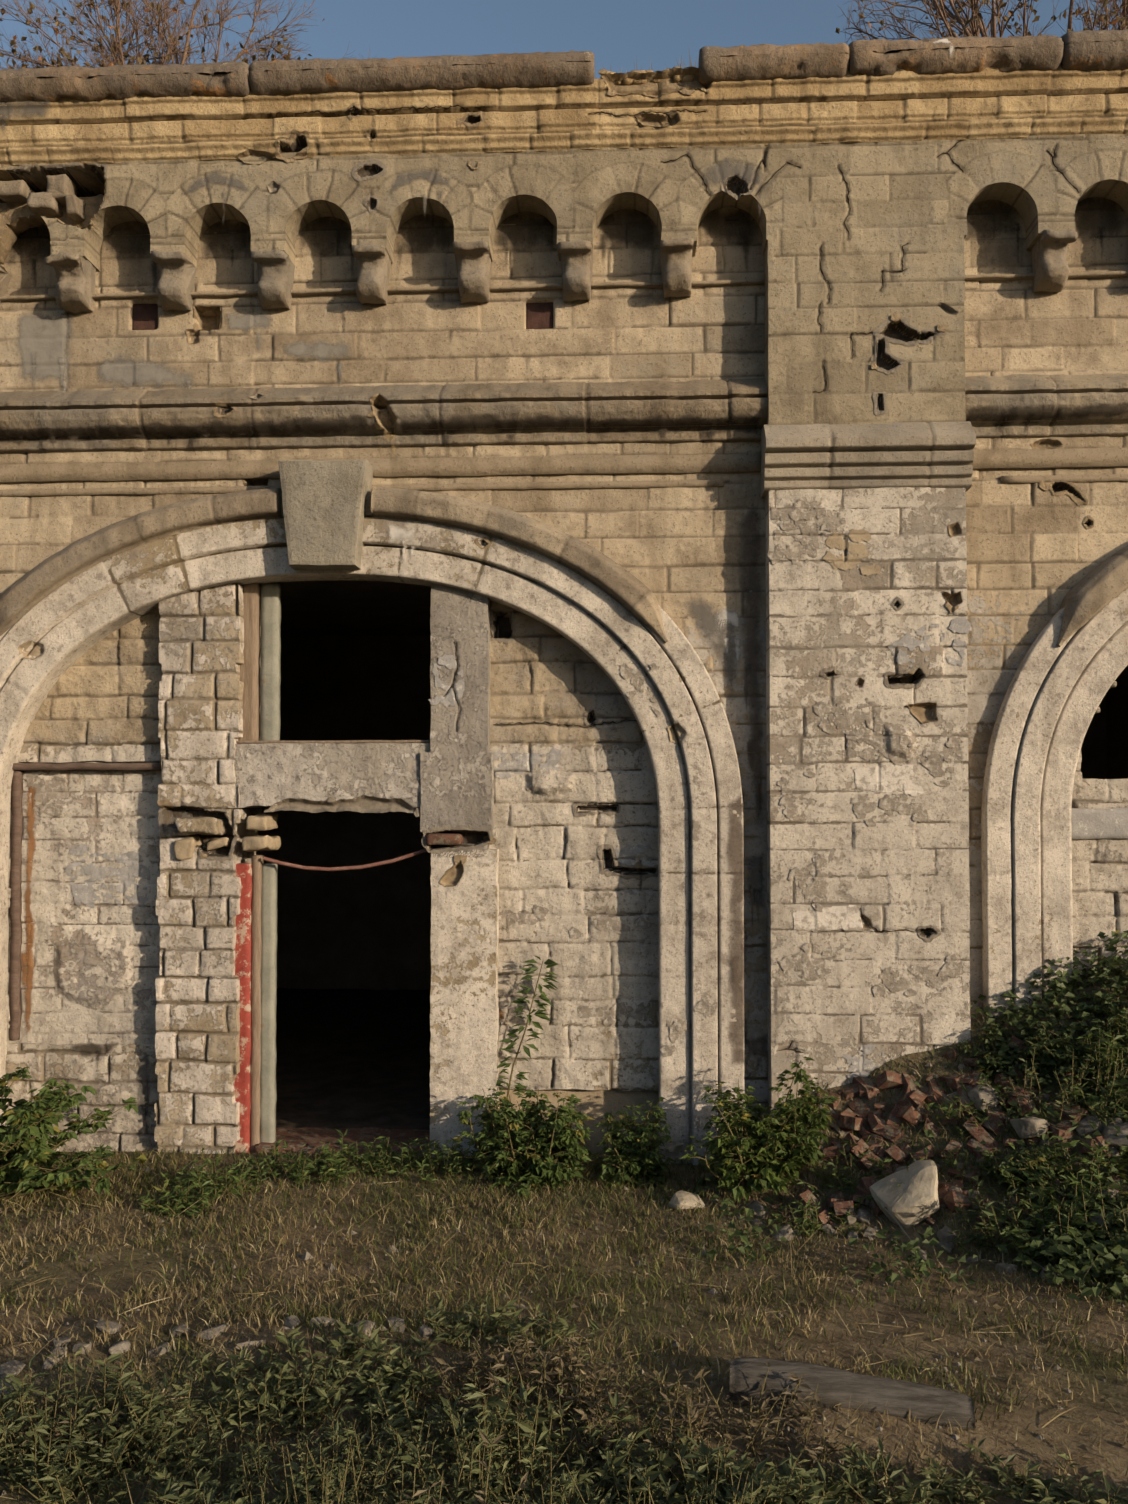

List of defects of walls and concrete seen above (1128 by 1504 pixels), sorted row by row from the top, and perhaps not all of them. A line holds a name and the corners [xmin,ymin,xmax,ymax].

spalling [0,162,108,265]
crack [750,146,801,196]
crack [937,138,966,173]
crack [1046,145,1079,193]
crack [813,164,872,393]
crack [881,243,909,289]
spalling [871,302,959,415]
peeling [813,591,972,827]
water stain [691,510,767,1066]